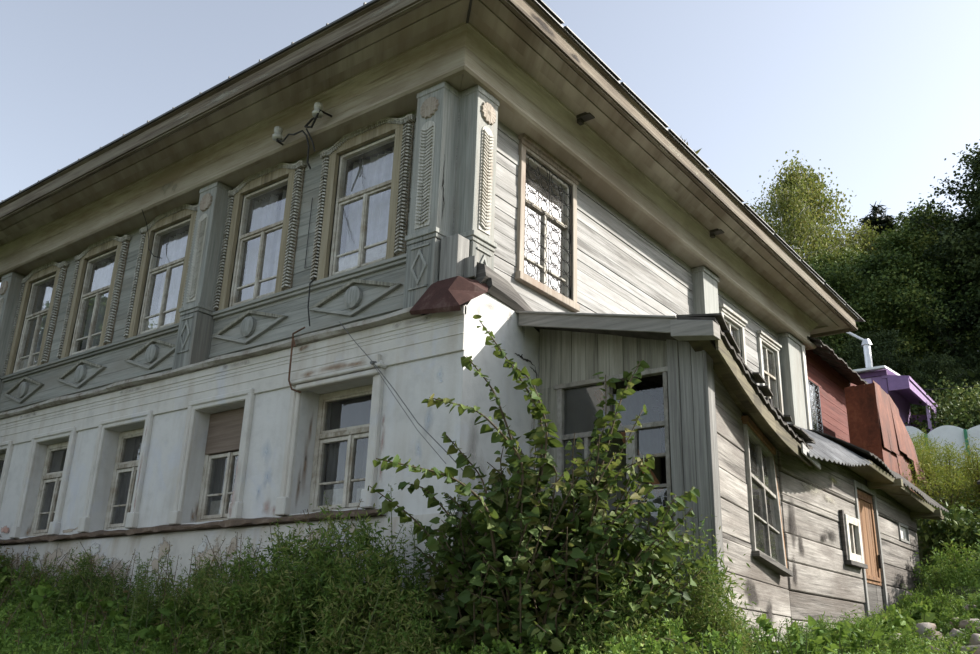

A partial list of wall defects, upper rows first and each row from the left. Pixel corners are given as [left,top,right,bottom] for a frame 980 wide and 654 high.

leakage [791,501,804,584]